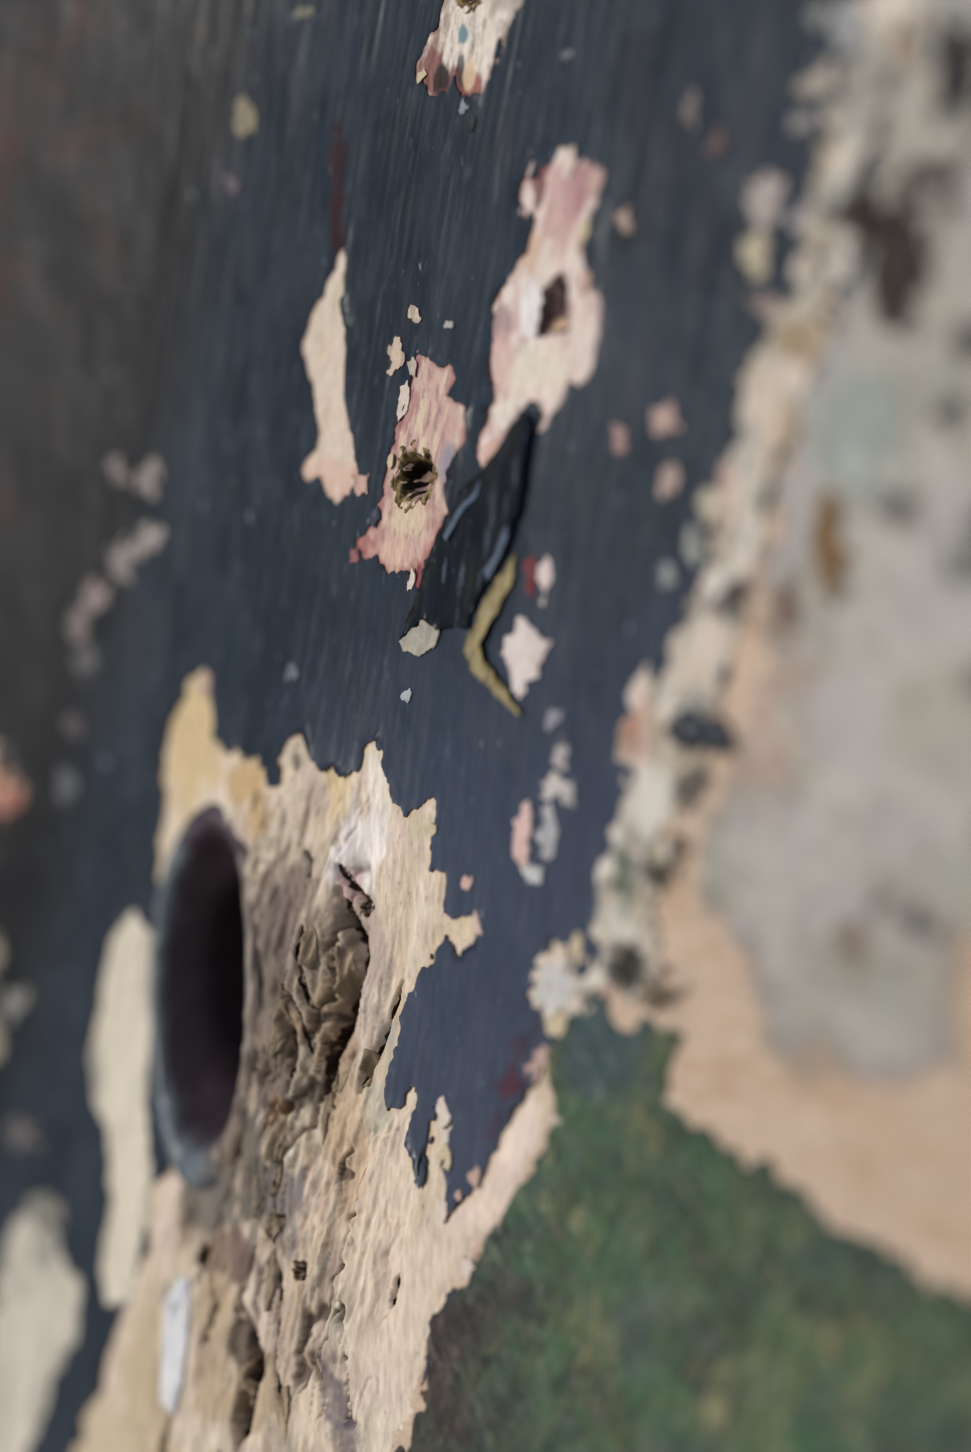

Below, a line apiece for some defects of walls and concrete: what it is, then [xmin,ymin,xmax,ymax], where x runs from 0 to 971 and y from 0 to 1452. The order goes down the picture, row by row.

peeling [234,96,256,137]
peeling [416,0,523,114]
peeling [105,454,162,500]
peeling [302,145,605,656]
peeling [529,0,925,1037]
peeling [63,521,166,682]
peeling [285,663,299,682]
peeling [500,616,553,698]
peeling [57,766,79,806]
peeling [513,709,575,883]
spalling [73,668,561,1452]
peeling [0,1188,81,1452]